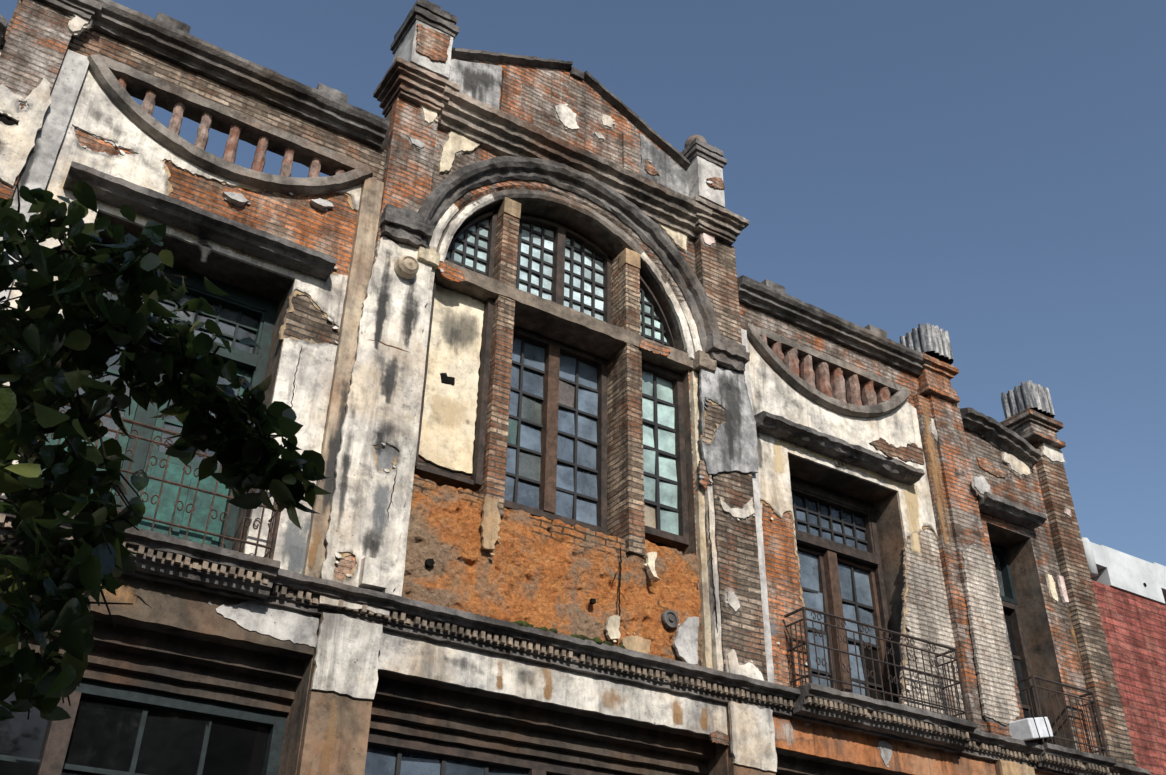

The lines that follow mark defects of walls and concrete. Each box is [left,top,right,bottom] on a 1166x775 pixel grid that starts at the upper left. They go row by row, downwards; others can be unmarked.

flaking render [439,131,480,173]
flaking render [163,159,358,276]
flaking render [277,289,340,346]
damp [375,252,390,348]
damp [404,281,418,345]
damp [382,358,397,403]
damp [323,383,349,510]
damp [377,425,392,449]
damp [364,486,389,558]
flaking render [208,600,319,648]
spalling [402,474,703,666]
flaking render [717,496,809,688]